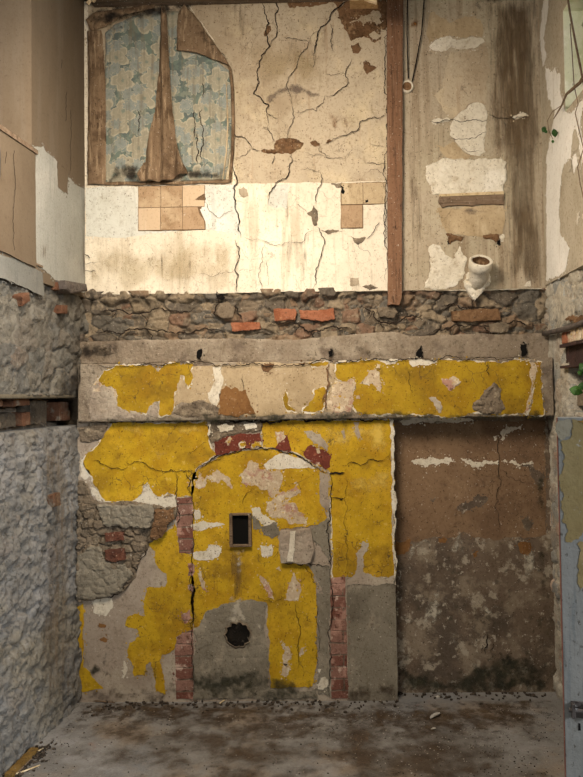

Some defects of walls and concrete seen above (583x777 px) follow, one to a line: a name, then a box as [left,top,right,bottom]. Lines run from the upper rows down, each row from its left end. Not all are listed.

peeling [85,0,387,198]
crack [201,2,388,319]
peeling [434,141,480,160]
peeling [424,10,492,125]
peeling [436,204,508,244]
damp [506,9,535,278]
peeling [540,0,583,281]
crack [94,442,390,695]
peeling [75,355,550,701]
damp [403,656,546,693]